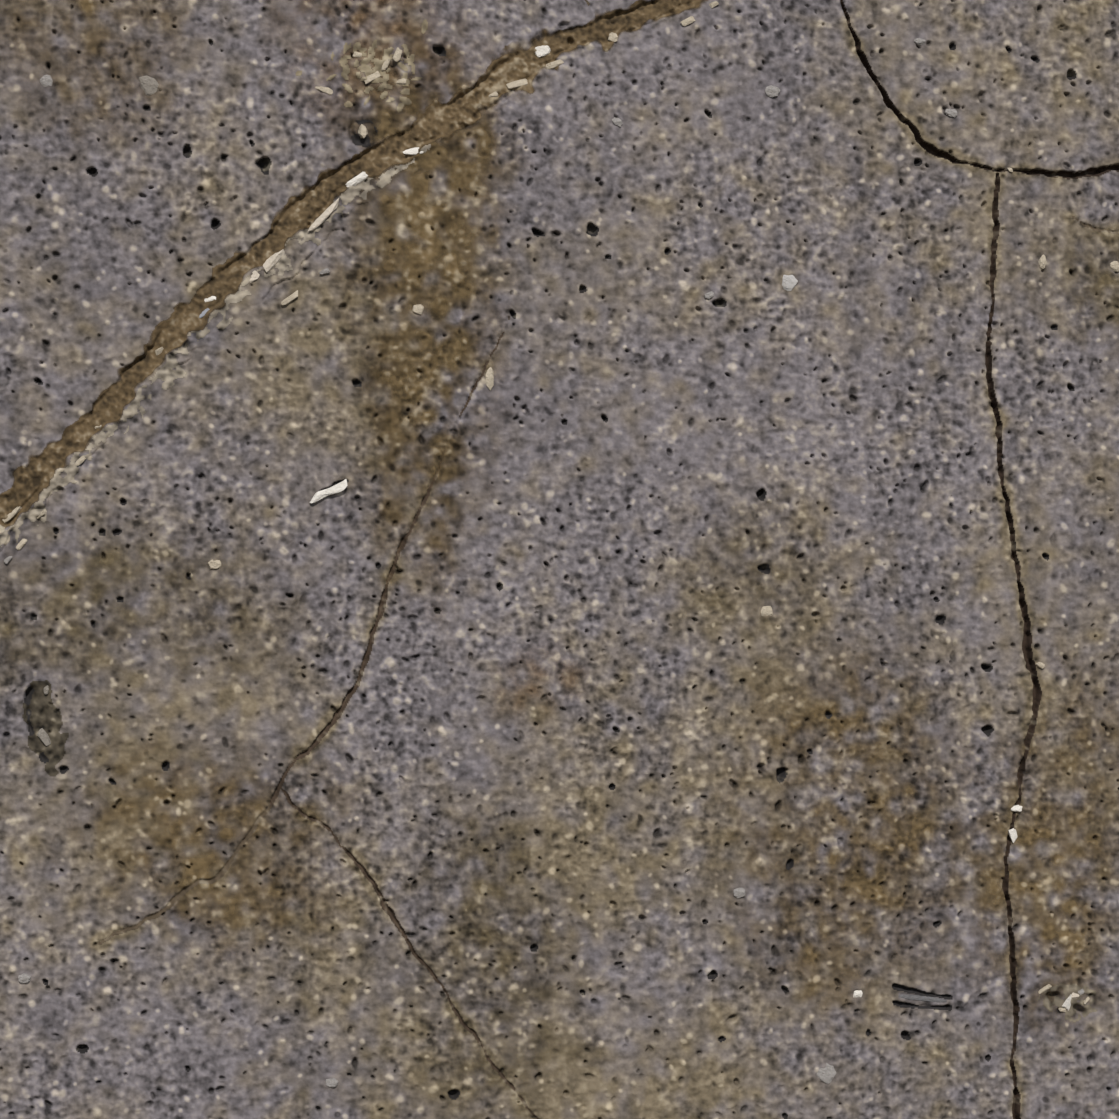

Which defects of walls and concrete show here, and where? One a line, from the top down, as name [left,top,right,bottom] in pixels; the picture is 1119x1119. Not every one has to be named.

crack [99,450,538,1119]
crack [0,0,719,564]
crack [840,0,1119,1119]